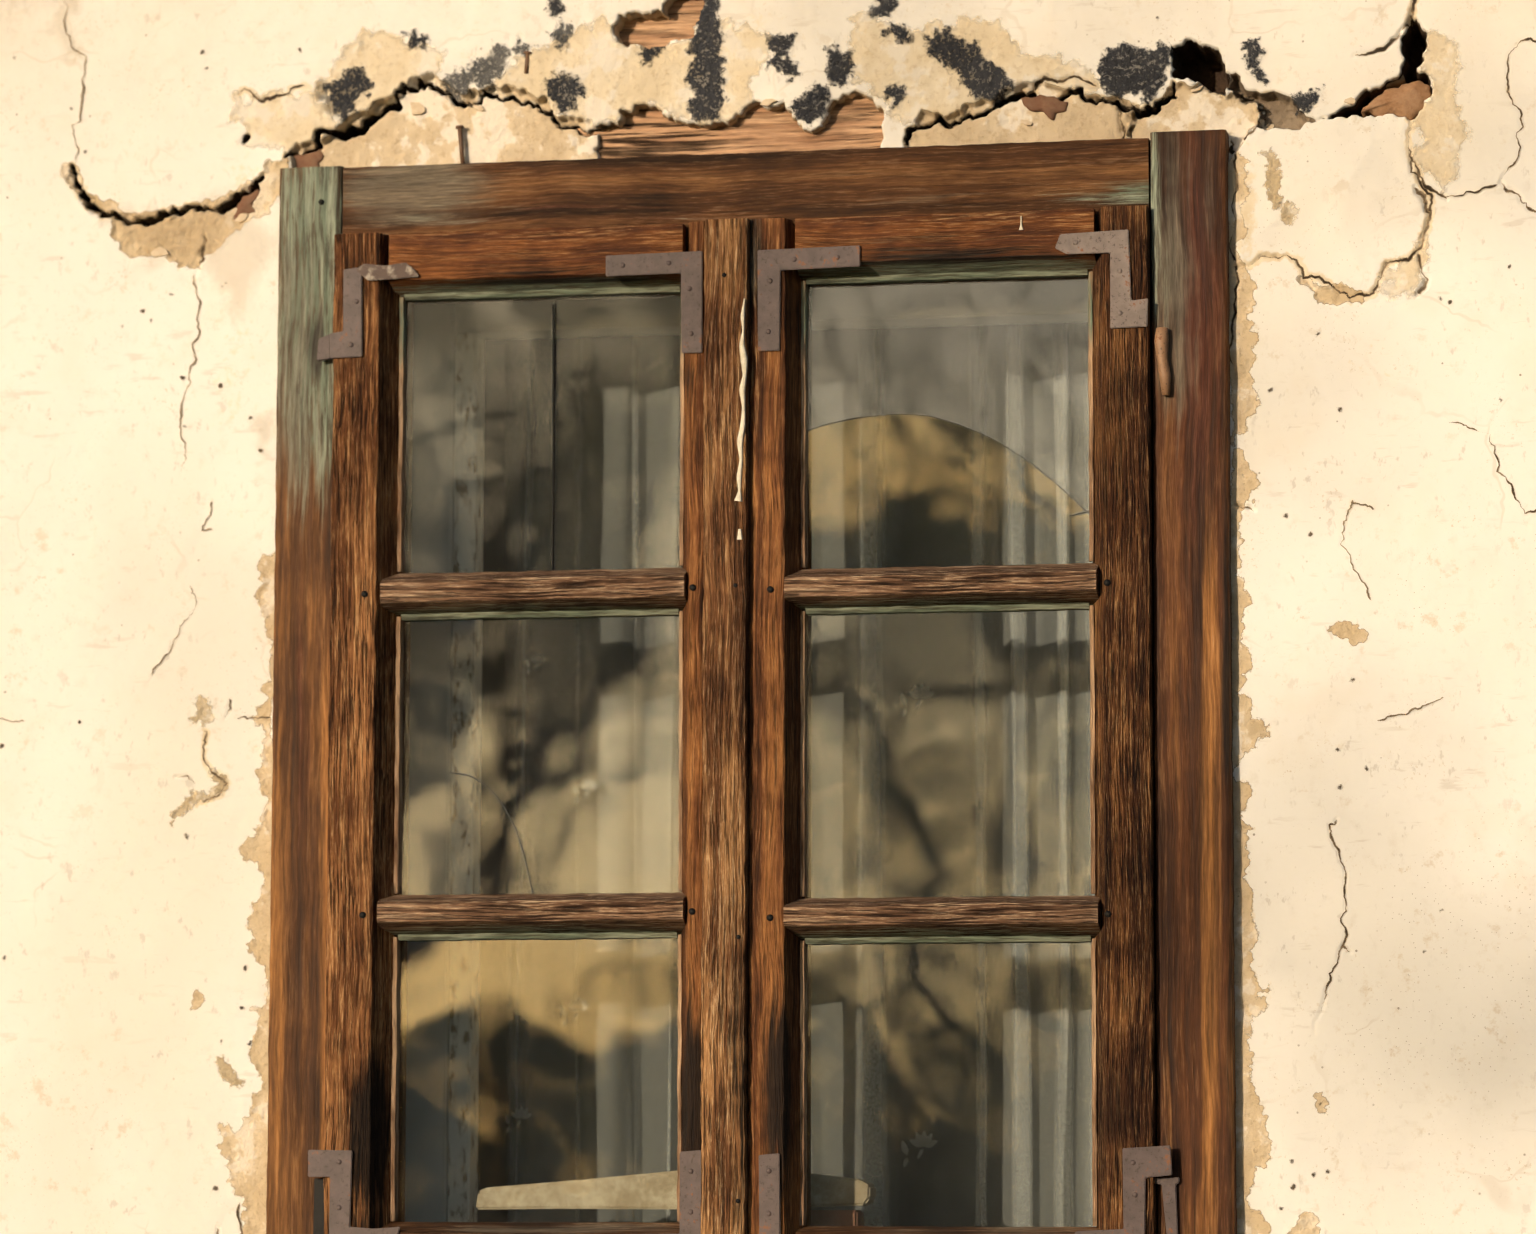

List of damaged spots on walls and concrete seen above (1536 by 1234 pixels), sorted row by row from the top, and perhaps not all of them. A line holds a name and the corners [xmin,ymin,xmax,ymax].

crack [1357,0,1417,56]
peeling [1329,19,1467,193]
crack [63,3,600,466]
peeling [1296,235,1429,305]
crack [1229,37,1536,363]
spalling [60,0,1316,770]
crack [151,588,197,675]
peeling [1327,621,1368,646]
peeling [213,553,275,1234]
crack [1324,820,1349,1000]
peeling [1233,777,1272,1234]
crack [216,1204,243,1234]